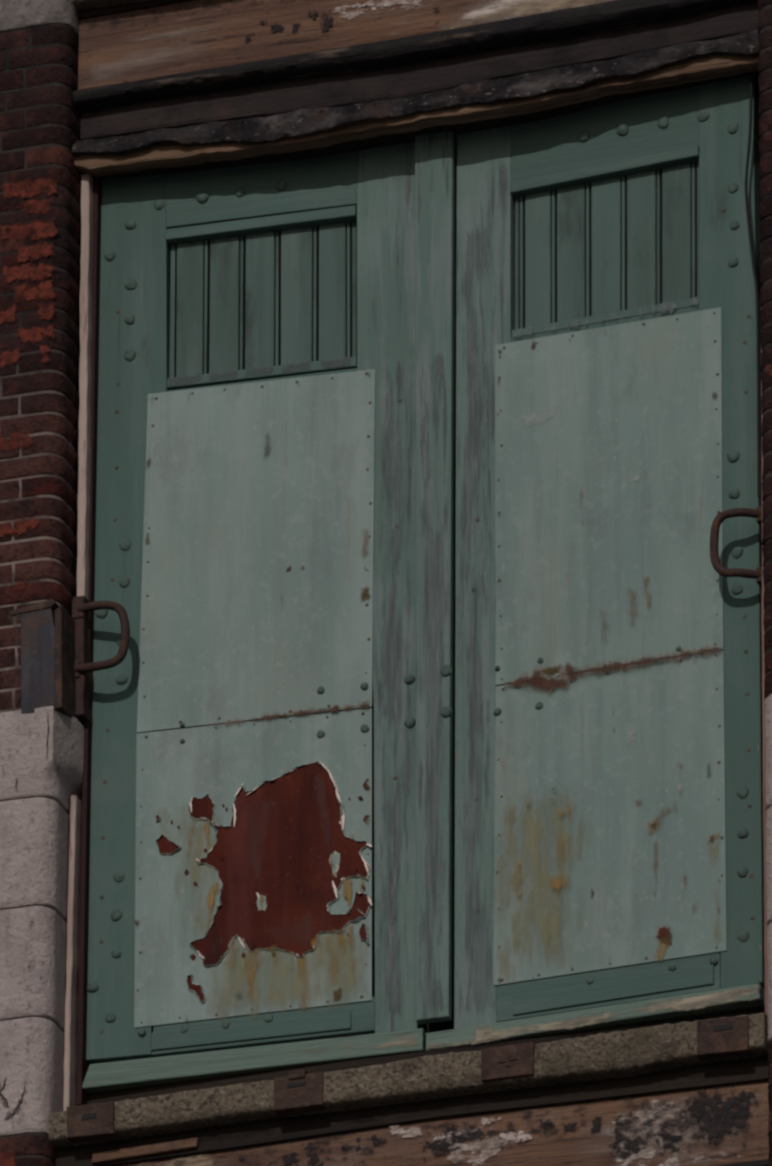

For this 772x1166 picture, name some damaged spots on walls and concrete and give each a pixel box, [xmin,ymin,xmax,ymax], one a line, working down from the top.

peeling [448,0,597,29]
corrosion [505,646,721,692]
peeling [155,815,182,856]
peeling [184,760,373,968]
peeling [187,974,207,1004]
leakage [422,1087,758,1160]
leakage [259,1134,386,1166]